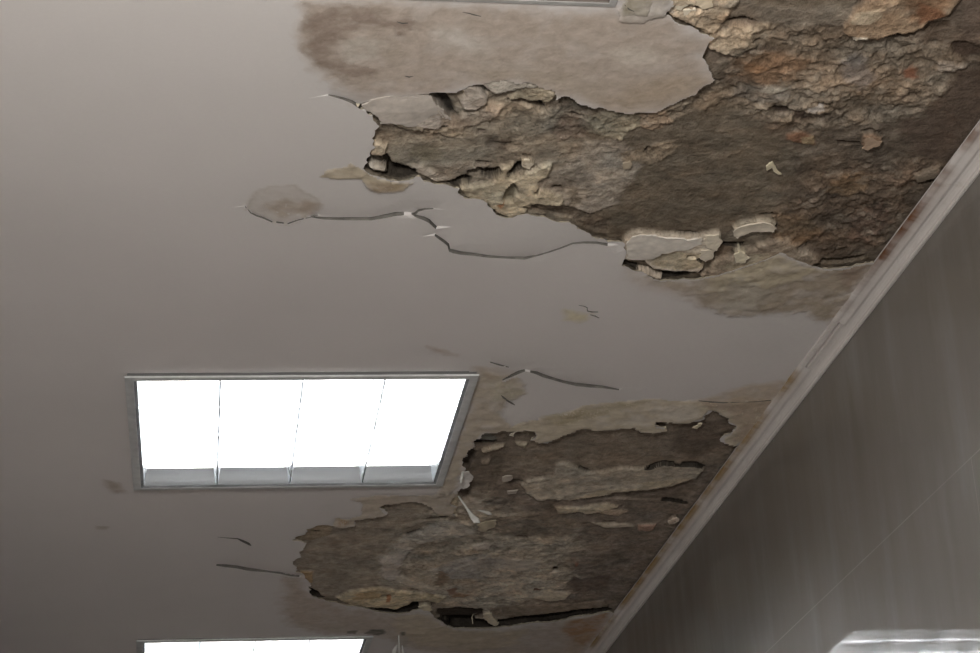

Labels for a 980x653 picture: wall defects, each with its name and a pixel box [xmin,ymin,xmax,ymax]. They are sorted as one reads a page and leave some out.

damp [287,0,715,114]
crack [328,94,359,108]
spalling [319,0,980,280]
crack [245,206,607,259]
damp [616,254,874,325]
crack [490,362,619,405]
spalling [293,364,772,628]
damp [585,363,811,653]
crack [216,537,299,577]
damp [269,572,588,653]